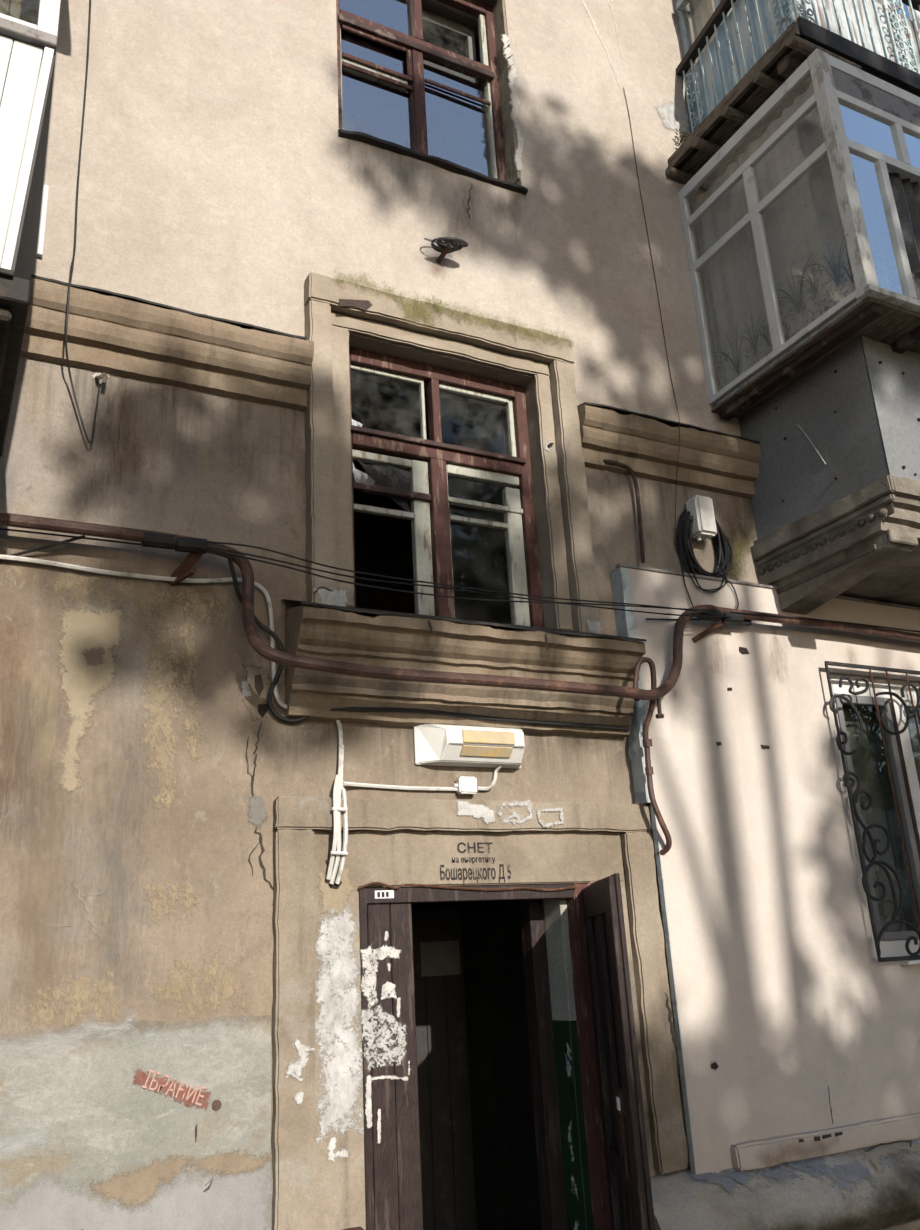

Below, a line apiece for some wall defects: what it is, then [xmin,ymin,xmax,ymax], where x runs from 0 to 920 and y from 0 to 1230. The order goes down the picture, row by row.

spalling [502,34,525,172]
leakage [335,274,574,346]
peeling [44,569,225,808]
crack [246,722,274,906]
peeling [286,868,364,1161]
spalling [90,1150,272,1212]
peeling [688,1140,920,1198]
spalling [799,1132,843,1142]